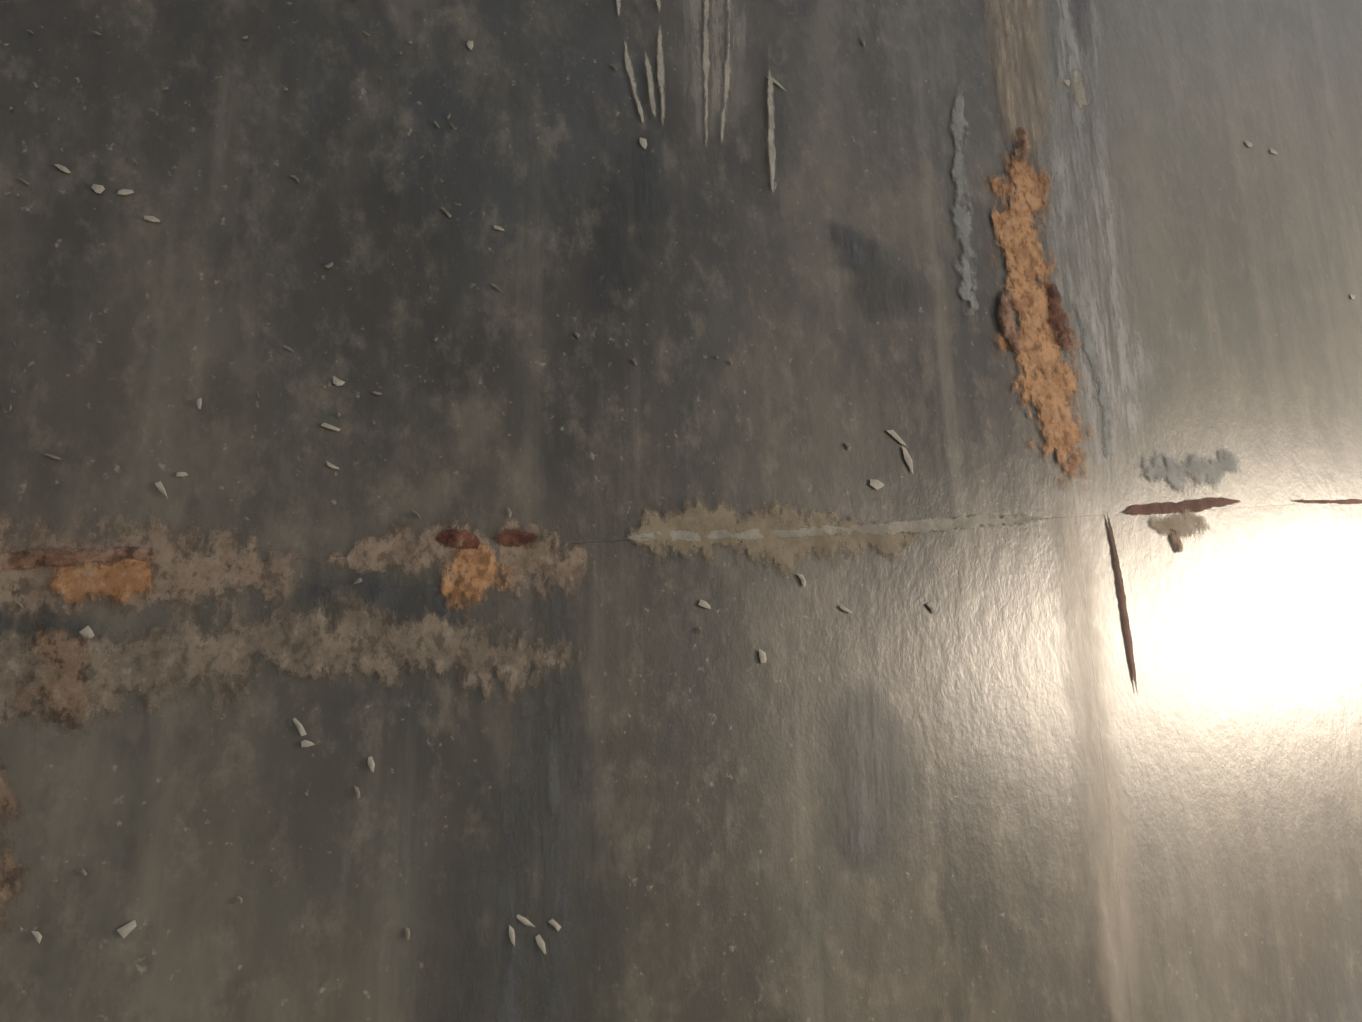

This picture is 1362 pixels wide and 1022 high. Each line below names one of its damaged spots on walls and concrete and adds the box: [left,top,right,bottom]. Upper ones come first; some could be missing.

corrosion [990,0,1092,482]
crack [1107,450,1241,695]
crack [1294,497,1362,505]
damp [839,695,901,863]
corrosion [1067,529,1127,975]